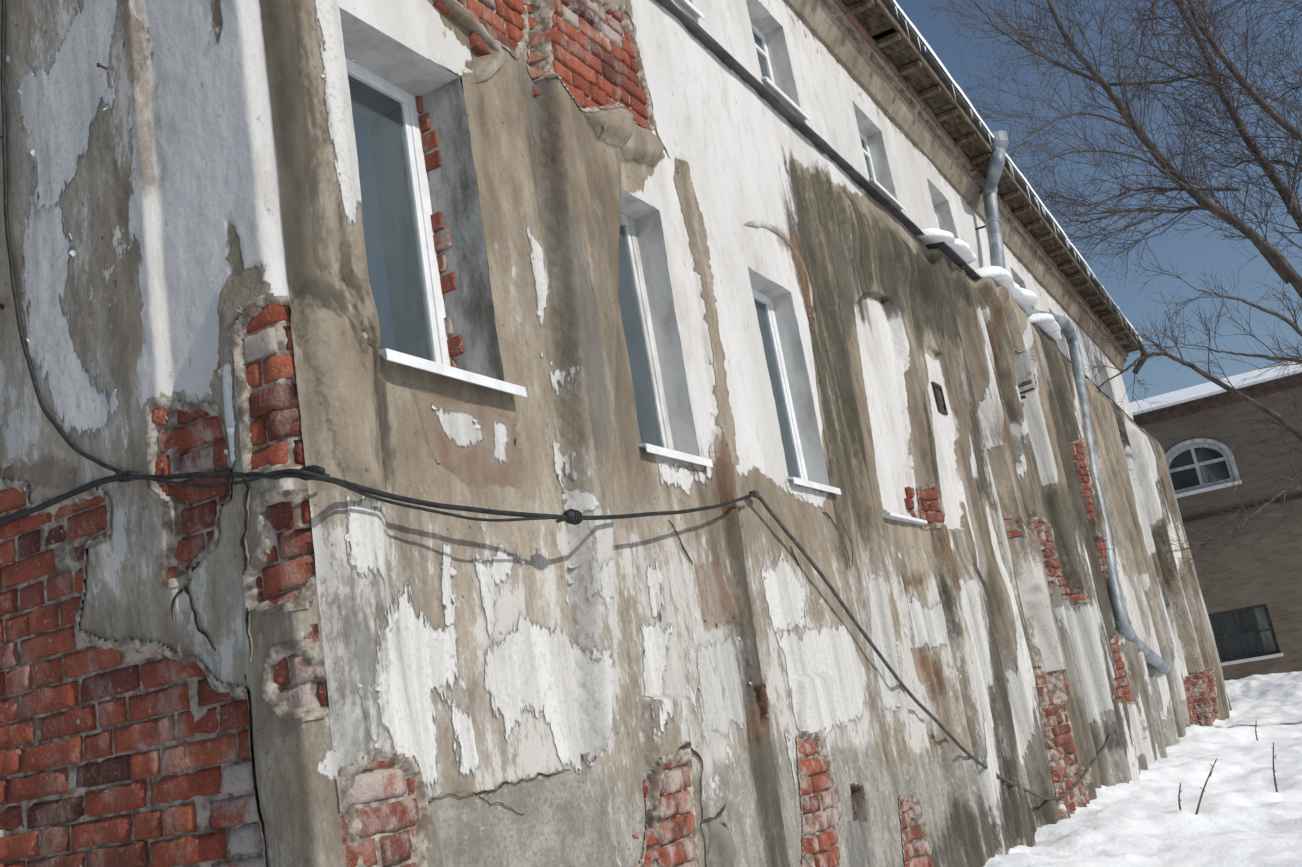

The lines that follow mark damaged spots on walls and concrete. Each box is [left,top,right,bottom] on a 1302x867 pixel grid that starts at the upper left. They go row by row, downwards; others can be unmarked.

flaking render [433,0,657,131]
damp [743,153,996,568]
flaking render [0,223,329,867]
crack [171,432,253,662]
peeling [336,494,481,867]
crack [428,768,571,816]
peeling [761,549,949,867]
damp [928,525,962,639]
damp [929,555,1059,867]
peeling [959,300,1146,828]
damp [1031,306,1134,757]
damp [1152,476,1178,586]